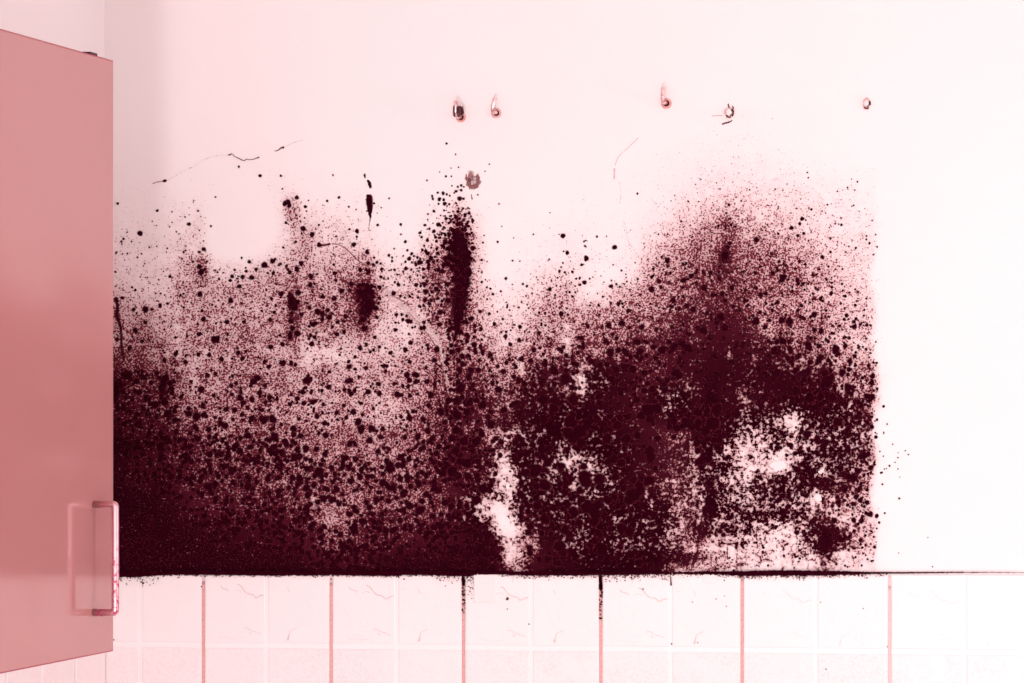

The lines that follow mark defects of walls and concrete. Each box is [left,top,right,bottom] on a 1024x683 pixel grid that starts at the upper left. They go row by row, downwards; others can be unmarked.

leakage [113,142,909,586]